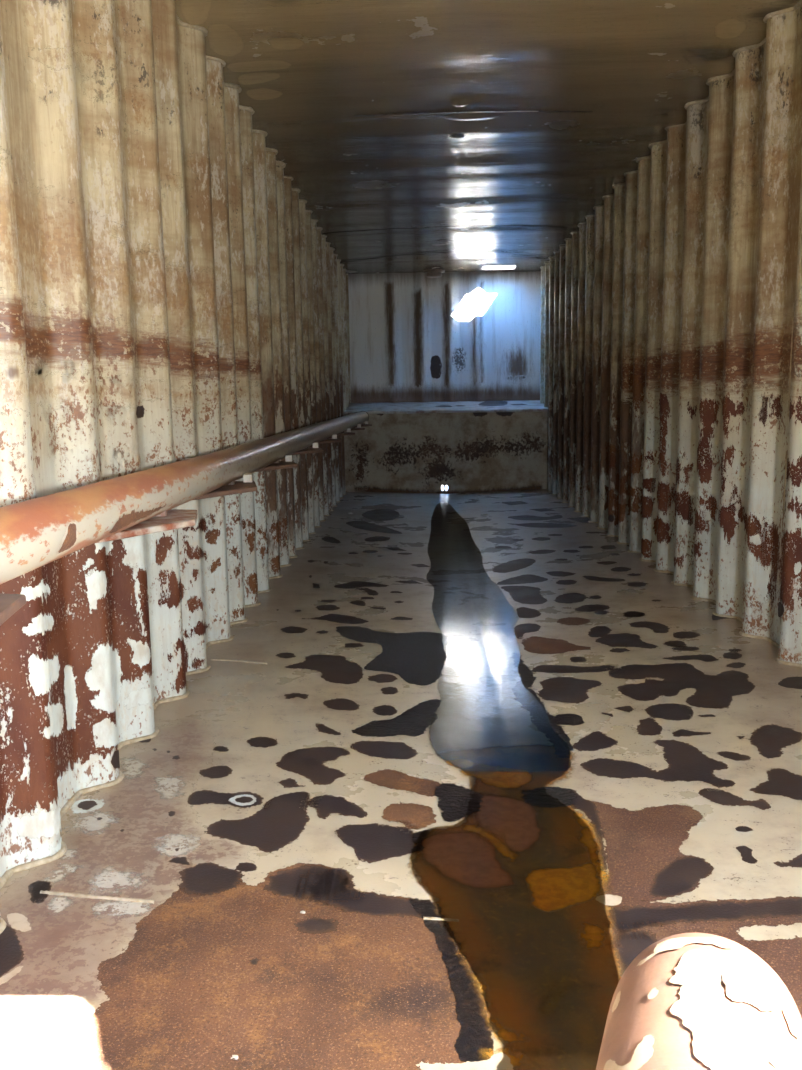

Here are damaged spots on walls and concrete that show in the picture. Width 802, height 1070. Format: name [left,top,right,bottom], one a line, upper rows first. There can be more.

corrosion [0,134,802,581]
peeling [0,504,288,916]
peeling [153,560,448,865]
peeling [346,509,430,567]
corrosion [740,580,802,664]
corrosion [0,717,494,1070]
peeling [603,1035,654,1070]
peeling [633,937,795,1070]